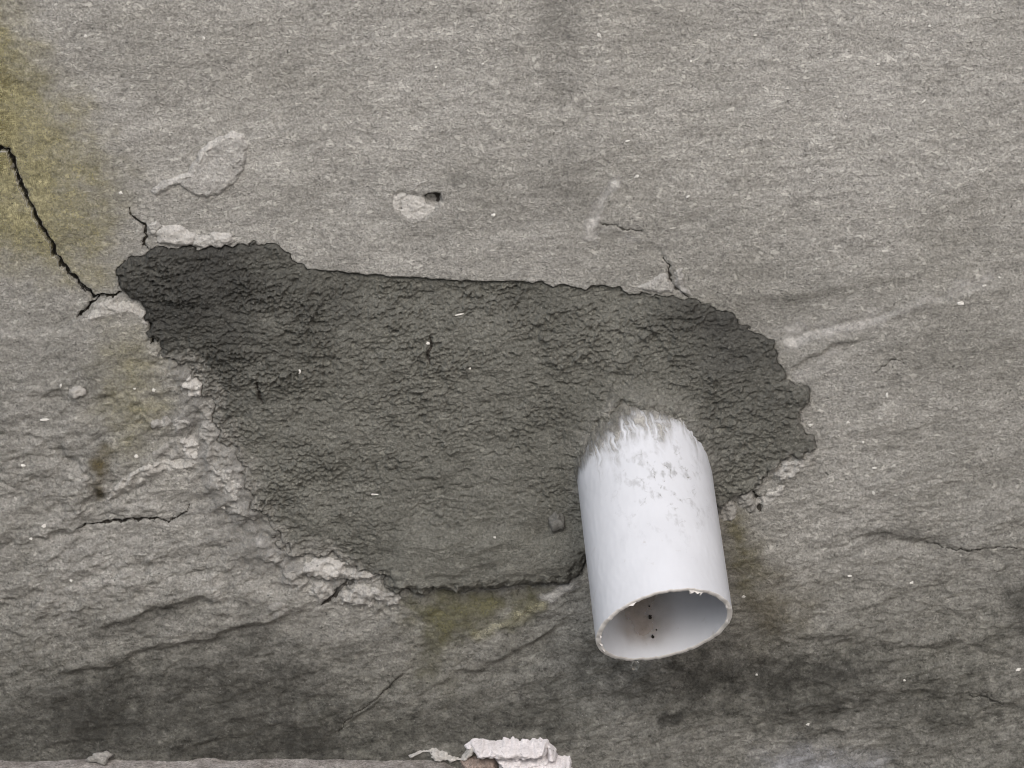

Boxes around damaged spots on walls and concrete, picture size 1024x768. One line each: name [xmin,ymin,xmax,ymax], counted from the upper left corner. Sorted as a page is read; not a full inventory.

water stain [0,29,100,254]
hole [389,181,441,224]
crack [0,145,120,316]
crack [129,207,151,250]
flaking render [147,221,234,248]
crack [79,504,190,528]
spalling [263,551,402,607]
water stain [513,583,577,620]